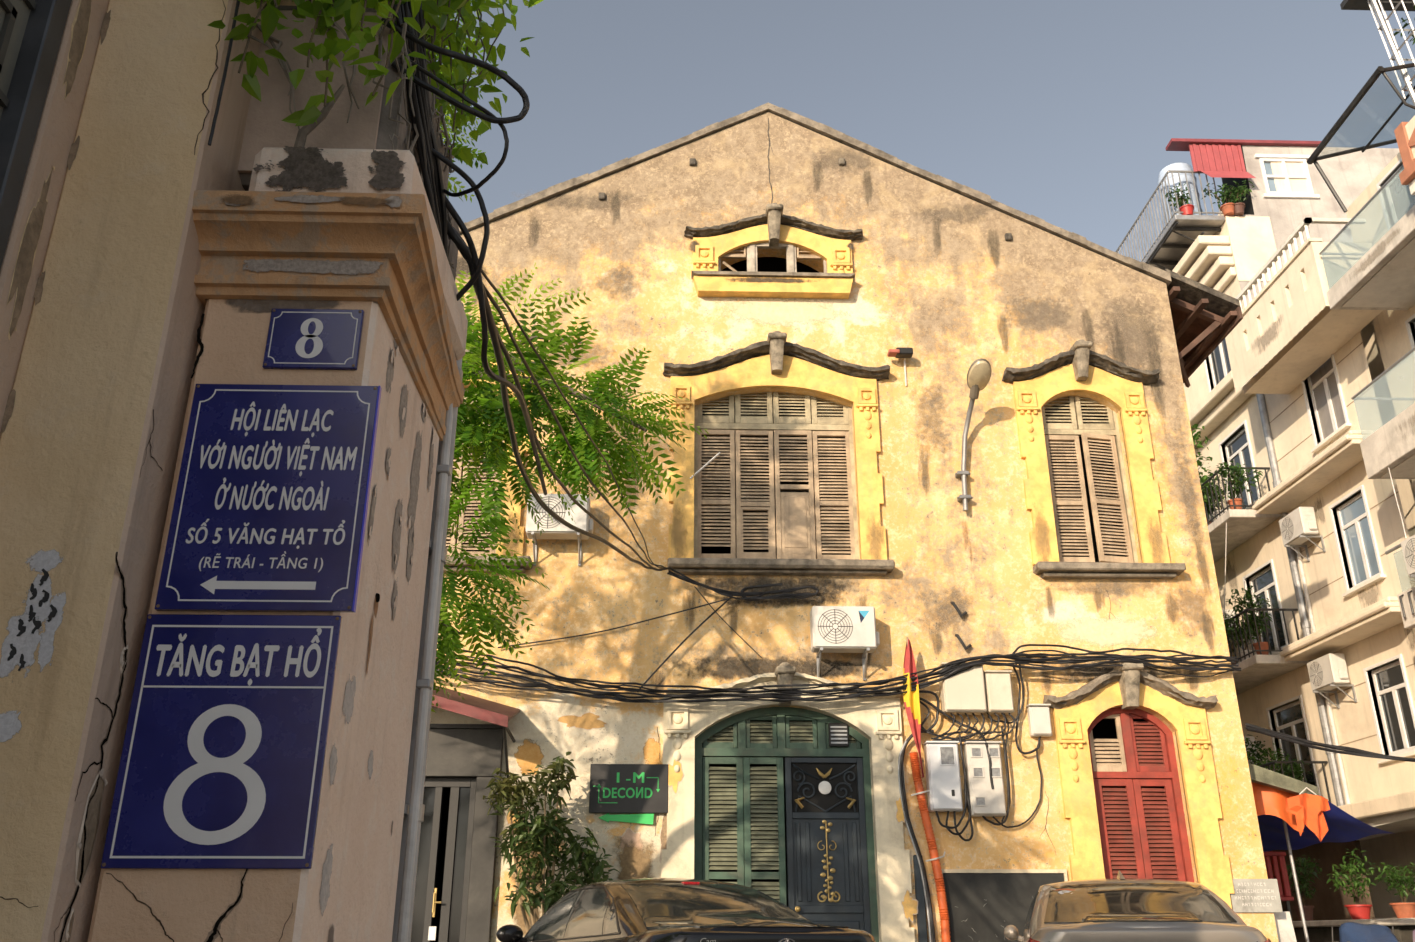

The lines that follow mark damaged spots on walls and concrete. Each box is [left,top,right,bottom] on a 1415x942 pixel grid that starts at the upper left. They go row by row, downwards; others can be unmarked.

peeling [254,146,348,203]
peeling [368,149,407,207]
water stain [456,257,469,279]
peeling [368,338,435,620]
water stain [697,576,849,625]
water stain [688,653,870,679]
crack [0,552,249,942]
peeling [556,712,608,730]